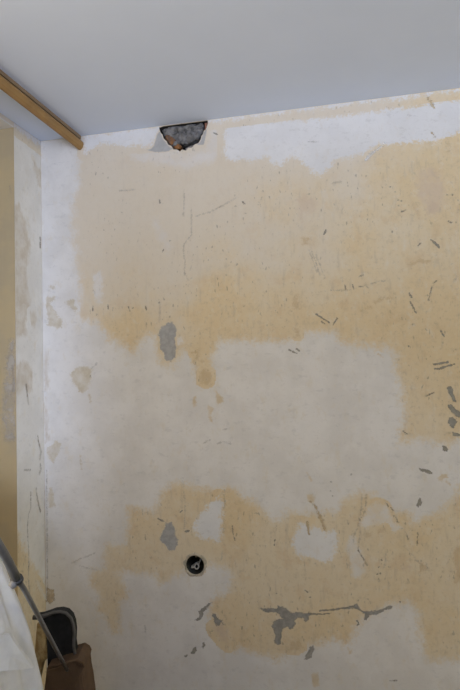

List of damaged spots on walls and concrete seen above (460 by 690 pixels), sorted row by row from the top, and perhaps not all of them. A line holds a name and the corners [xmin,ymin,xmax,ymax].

spalling [146,121,218,153]
peeling [14,136,460,690]
water stain [206,614,235,653]